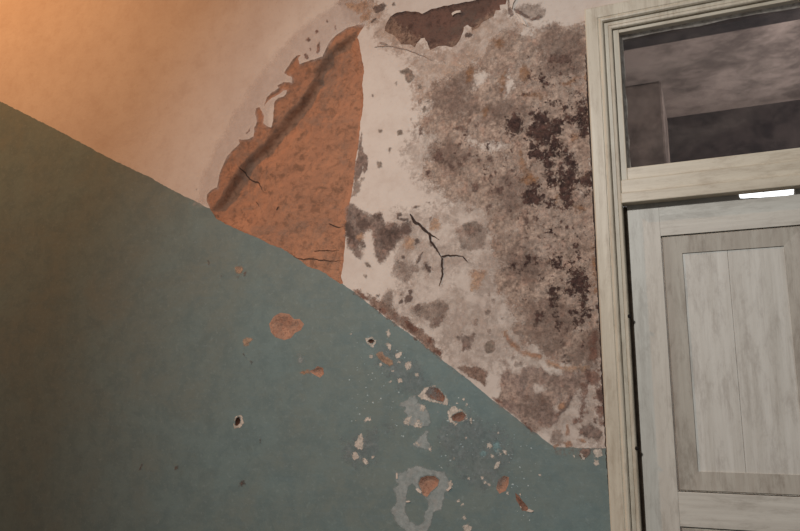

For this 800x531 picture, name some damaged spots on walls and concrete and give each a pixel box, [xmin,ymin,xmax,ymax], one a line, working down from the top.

flaking render [385,0,543,50]
spalling [206,24,365,284]
water stain [342,134,447,327]
crack [410,214,468,285]
water stain [400,21,602,448]
peeling [269,313,304,340]
peeling [400,385,472,452]
peeling [391,466,453,531]
peeling [481,443,534,512]